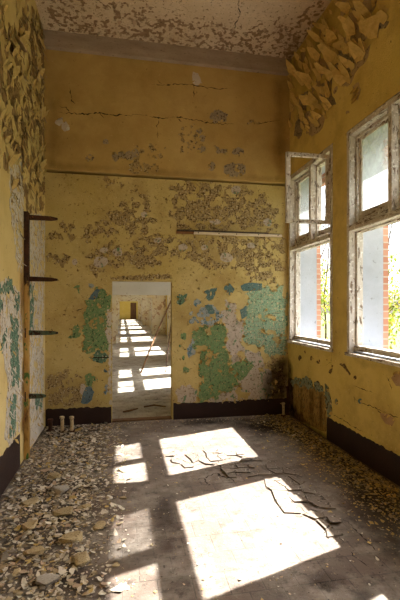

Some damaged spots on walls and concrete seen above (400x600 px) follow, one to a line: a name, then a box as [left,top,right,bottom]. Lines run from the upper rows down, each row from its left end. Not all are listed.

crack [60,90,224,137]
peeling [0,0,390,447]
leakage [265,360,313,430]
crack [179,455,237,486]